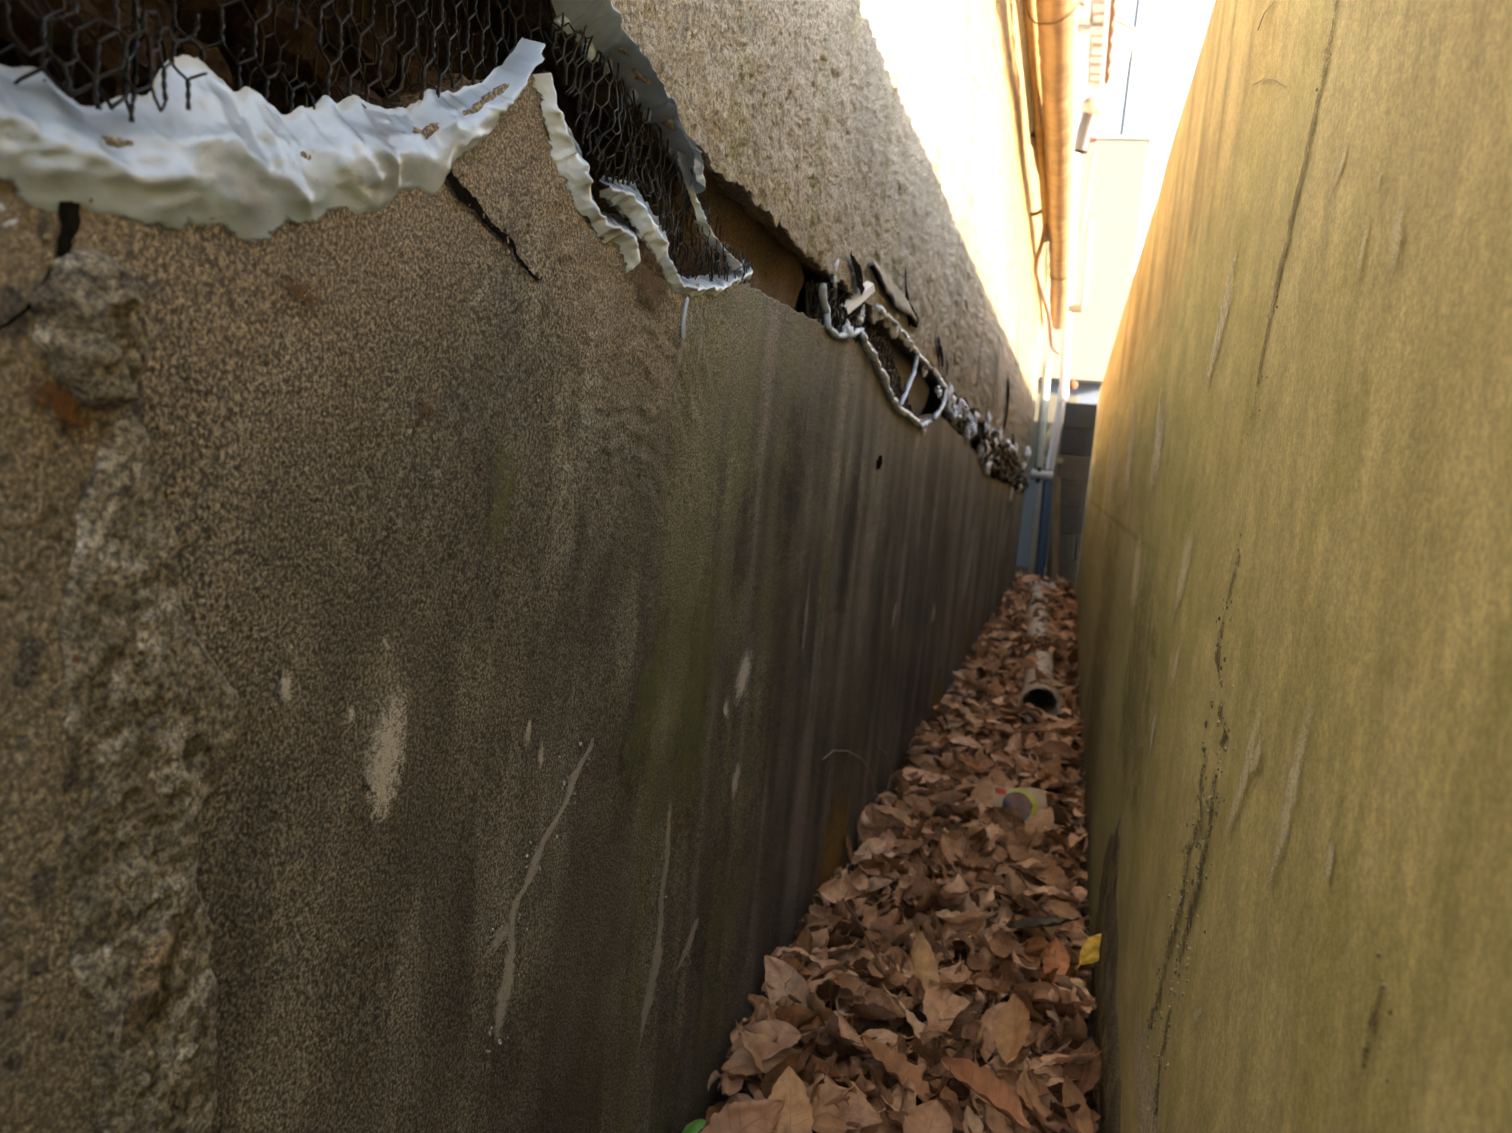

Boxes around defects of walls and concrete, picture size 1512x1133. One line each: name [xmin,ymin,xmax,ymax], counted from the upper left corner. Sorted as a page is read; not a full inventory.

spalling [0,0,753,341]
crack [445,167,542,281]
spalling [804,257,1031,502]
crack [1247,0,1338,435]
crack [1140,533,1242,1133]
crack [1359,952,1392,1082]